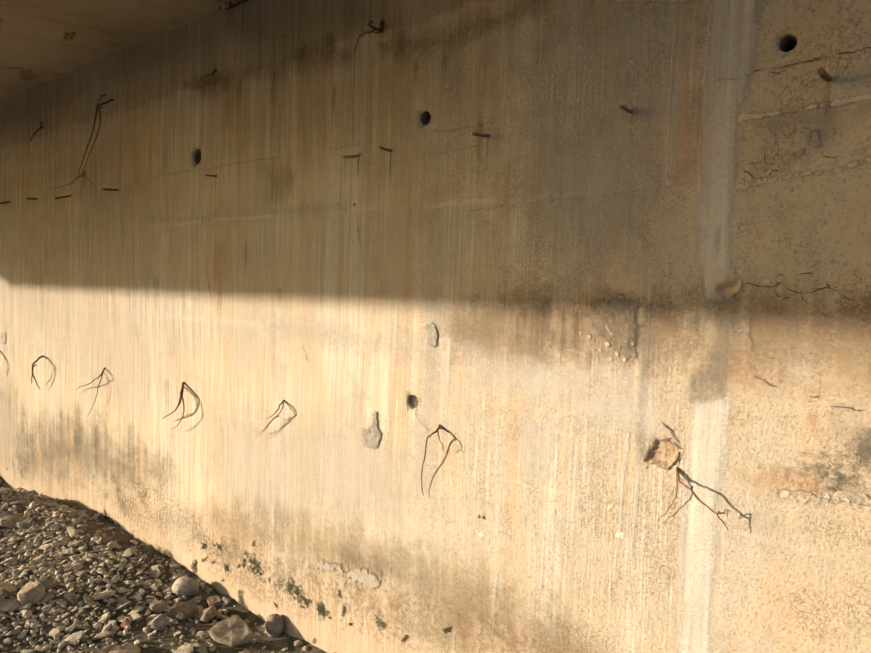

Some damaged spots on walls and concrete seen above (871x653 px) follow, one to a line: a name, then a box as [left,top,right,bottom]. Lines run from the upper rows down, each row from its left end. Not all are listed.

crack [709,47,871,83]
crack [745,272,871,318]
crack [749,316,776,387]